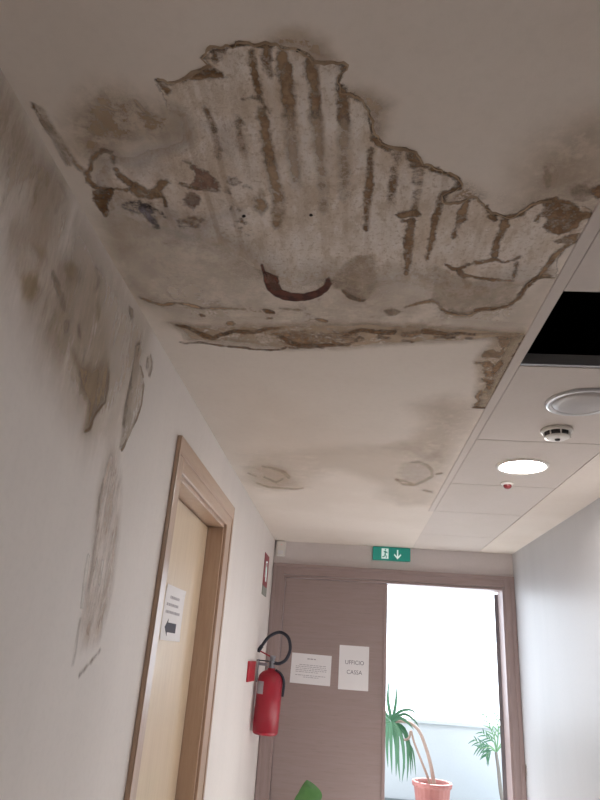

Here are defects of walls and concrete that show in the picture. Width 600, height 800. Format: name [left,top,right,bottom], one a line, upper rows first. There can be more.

leakage [84,98,166,150]
flaking render [85,40,592,317]
mould [123,201,163,229]
rust [261,264,332,302]
peeling [176,325,525,409]